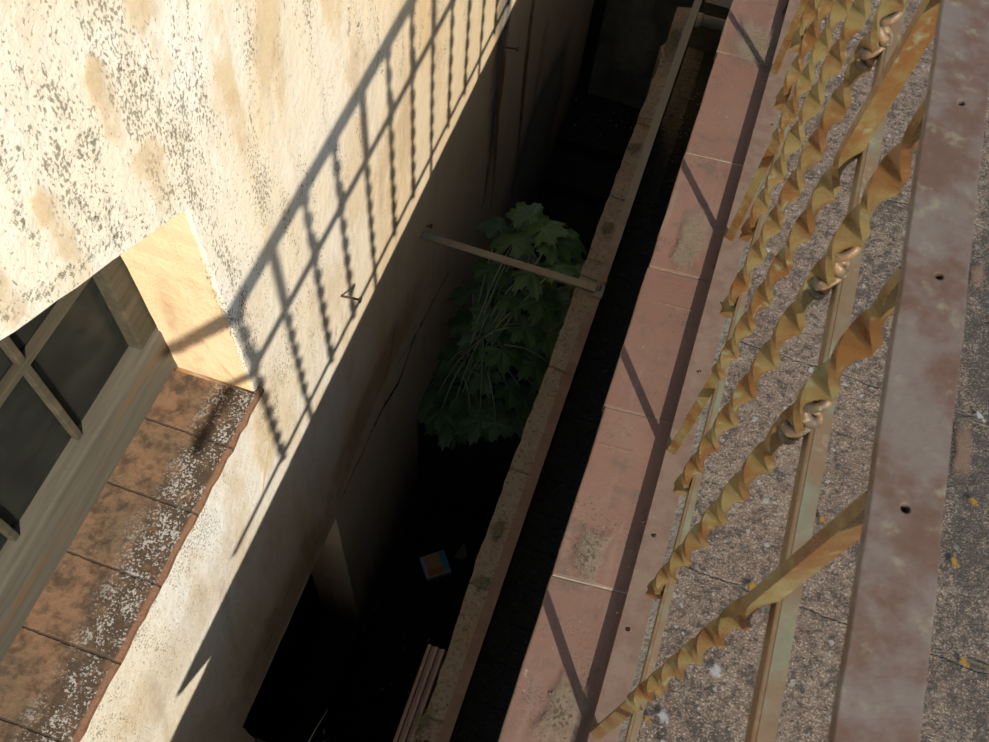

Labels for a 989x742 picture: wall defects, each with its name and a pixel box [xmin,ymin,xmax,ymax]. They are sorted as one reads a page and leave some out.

damp [117,51,154,107]
damp [217,58,238,101]
damp [0,140,52,250]
damp [0,172,151,323]
damp [69,128,105,177]
damp [204,213,256,356]
crack [341,273,449,500]